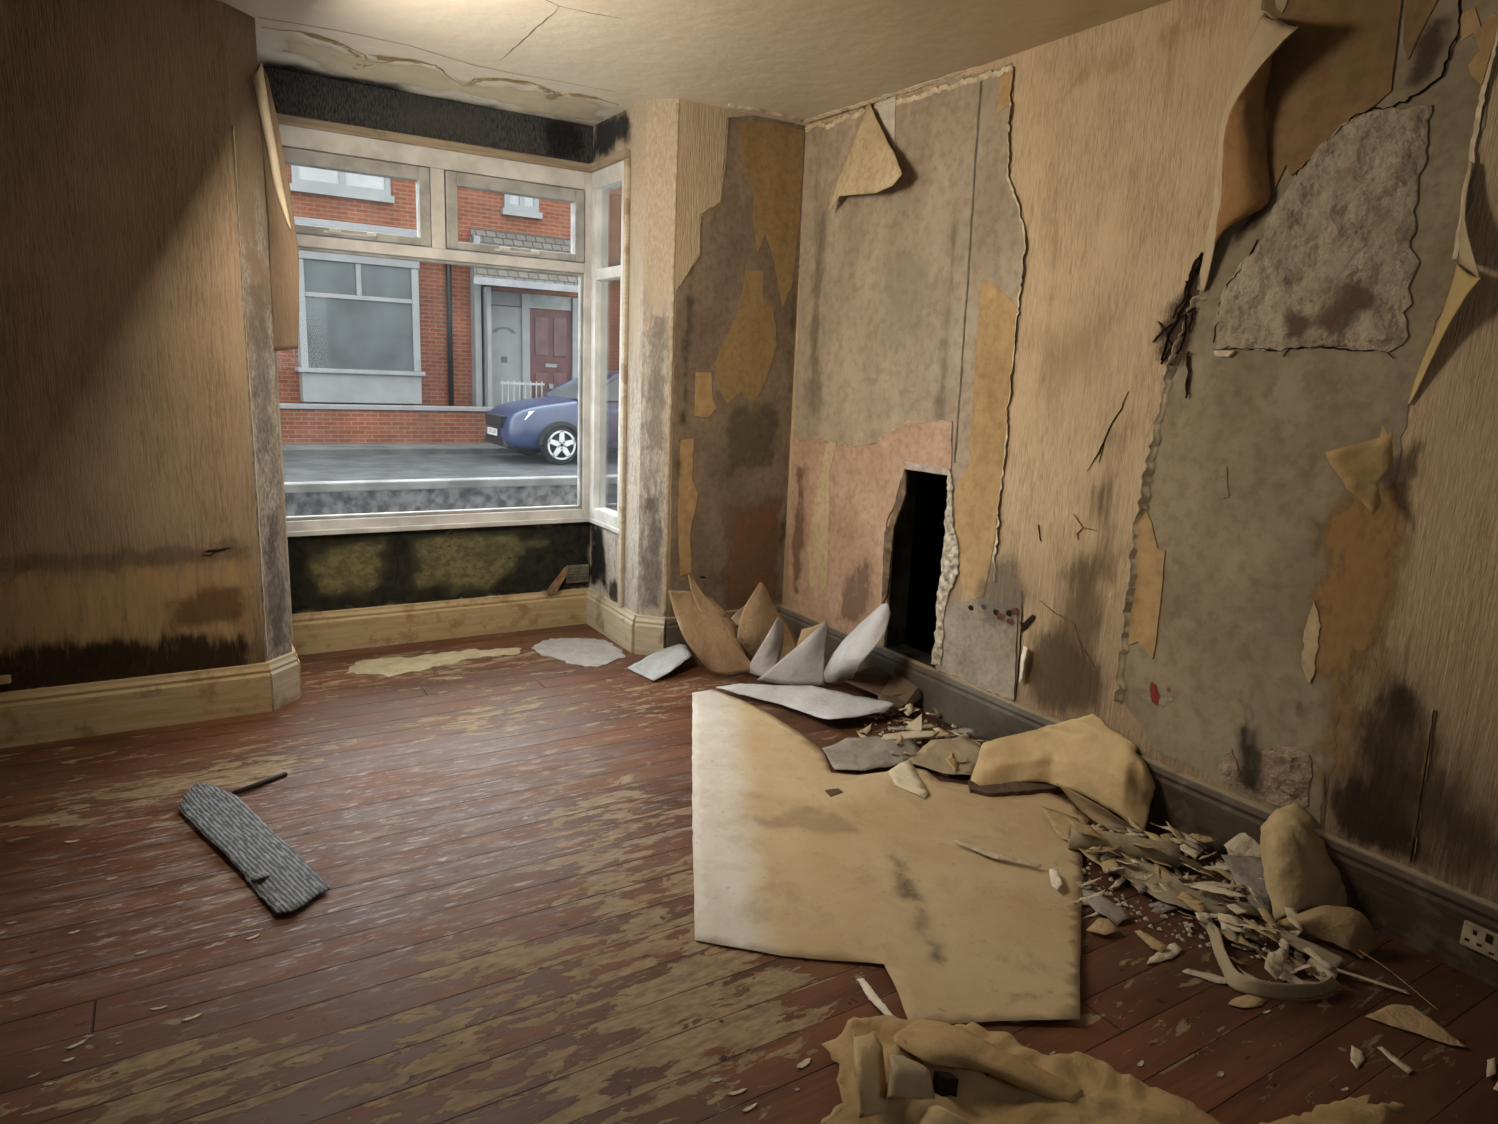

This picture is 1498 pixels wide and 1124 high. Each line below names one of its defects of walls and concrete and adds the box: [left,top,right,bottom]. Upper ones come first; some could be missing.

crack [258,0,621,92]
flaking render [1213,105,1433,359]
damp [1153,252,1205,398]
damp [0,555,253,692]
damp [287,522,617,614]
flaking render [787,420,960,665]
spalling [993,608,1019,625]
damp [1237,722,1254,790]
damp [1320,683,1498,890]